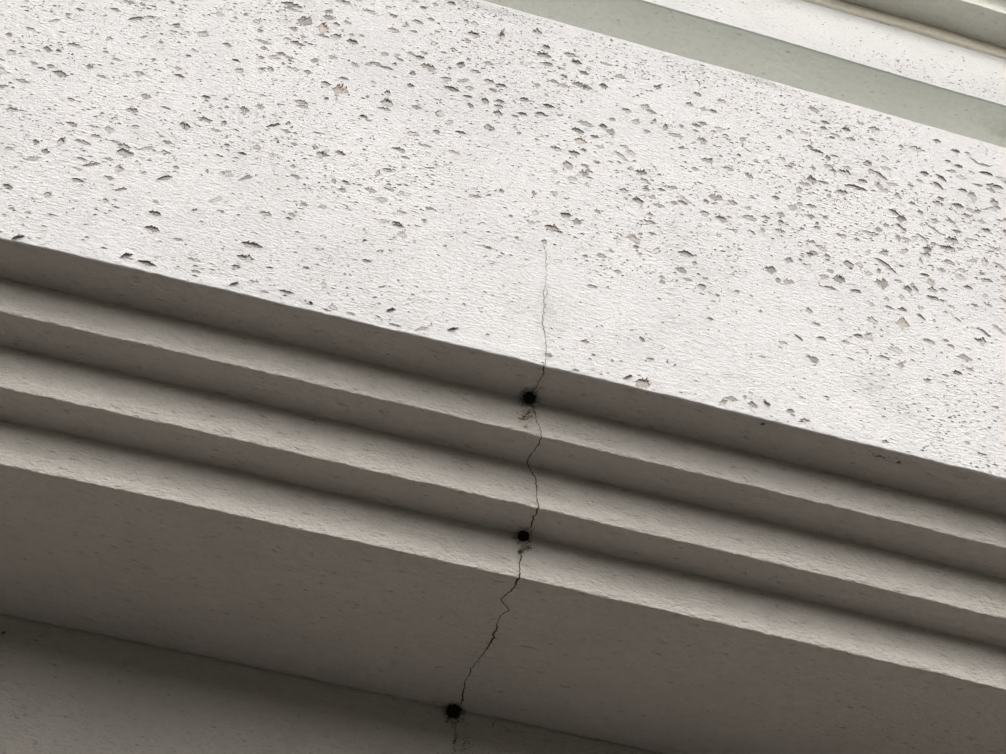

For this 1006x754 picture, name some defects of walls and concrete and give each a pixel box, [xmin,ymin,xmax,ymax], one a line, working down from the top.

crack [526,243,548,531]
crack [454,553,522,753]